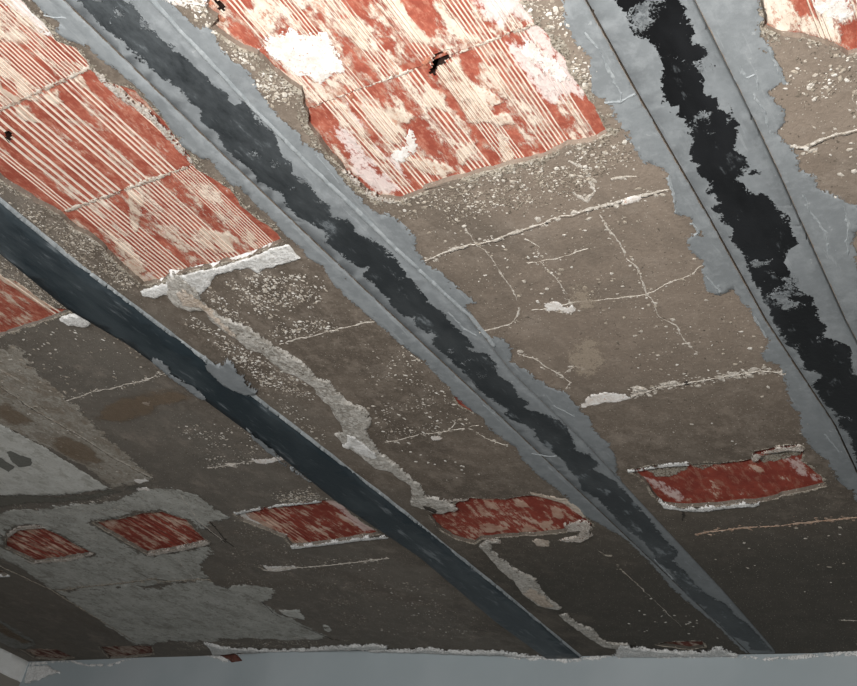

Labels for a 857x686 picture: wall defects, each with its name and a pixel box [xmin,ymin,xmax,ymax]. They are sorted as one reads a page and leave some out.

crack [789,98,857,156]
crack [421,160,703,355]
spalling [615,0,857,463]
spalling [77,0,773,652]
crack [517,350,786,408]
flaking render [627,444,827,512]
flaking render [3,524,93,564]
peeling [203,640,818,663]